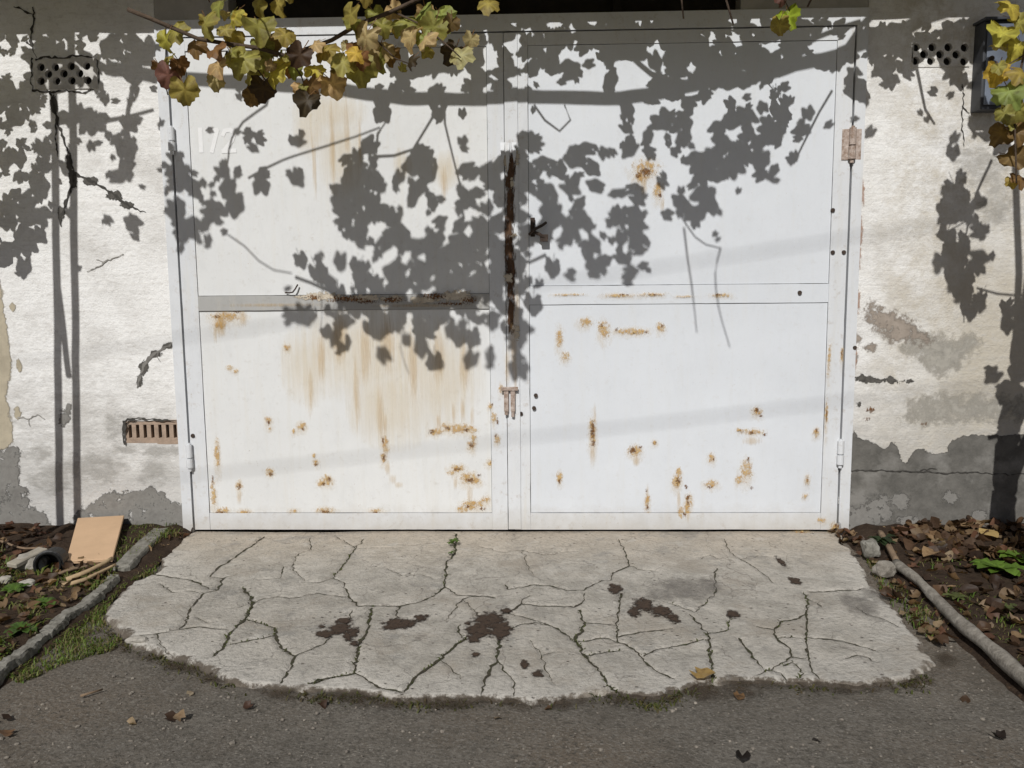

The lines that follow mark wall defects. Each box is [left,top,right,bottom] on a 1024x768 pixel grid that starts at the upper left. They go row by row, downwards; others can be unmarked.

crack [14,6,145,227]
corrosion [636,158,662,198]
corrosion [503,150,520,341]
spalling [0,284,51,526]
crack [136,342,173,388]
corrosion [430,423,476,447]
corrosion [581,318,663,336]
peeling [855,302,977,384]
spalling [72,486,195,526]
corrosion [672,468,692,518]
spalling [849,432,1024,530]
crack [130,534,895,696]